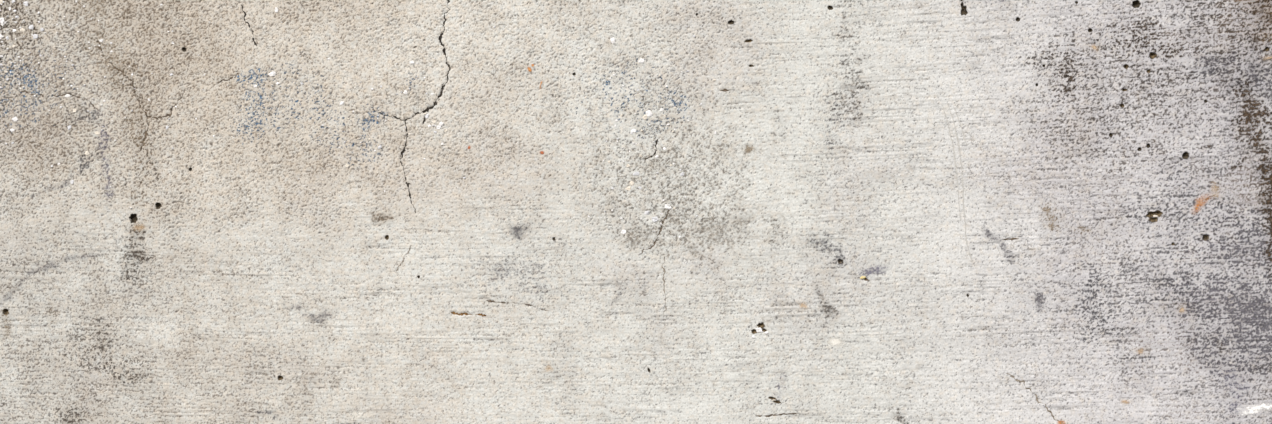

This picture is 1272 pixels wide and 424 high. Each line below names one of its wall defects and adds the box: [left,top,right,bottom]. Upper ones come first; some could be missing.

crack [372,0,450,213]